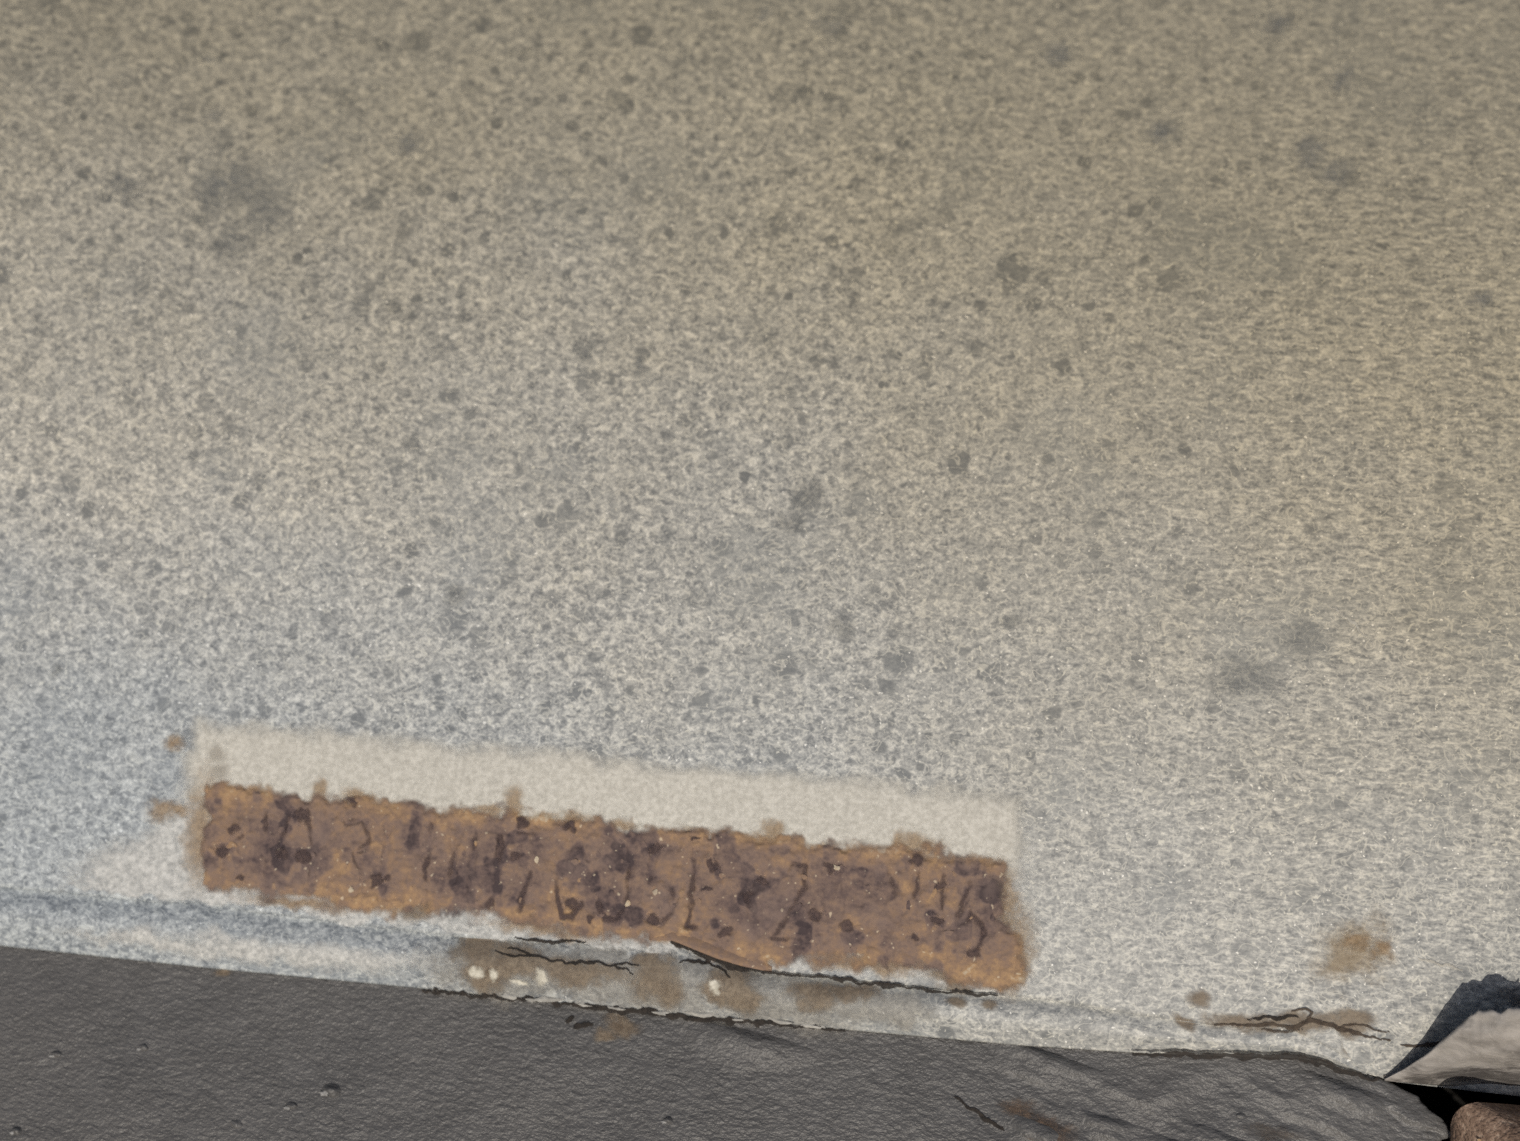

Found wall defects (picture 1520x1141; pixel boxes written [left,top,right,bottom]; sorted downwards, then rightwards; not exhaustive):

rust [154,781,1026,1012]
crack [1132,1008,1441,1082]